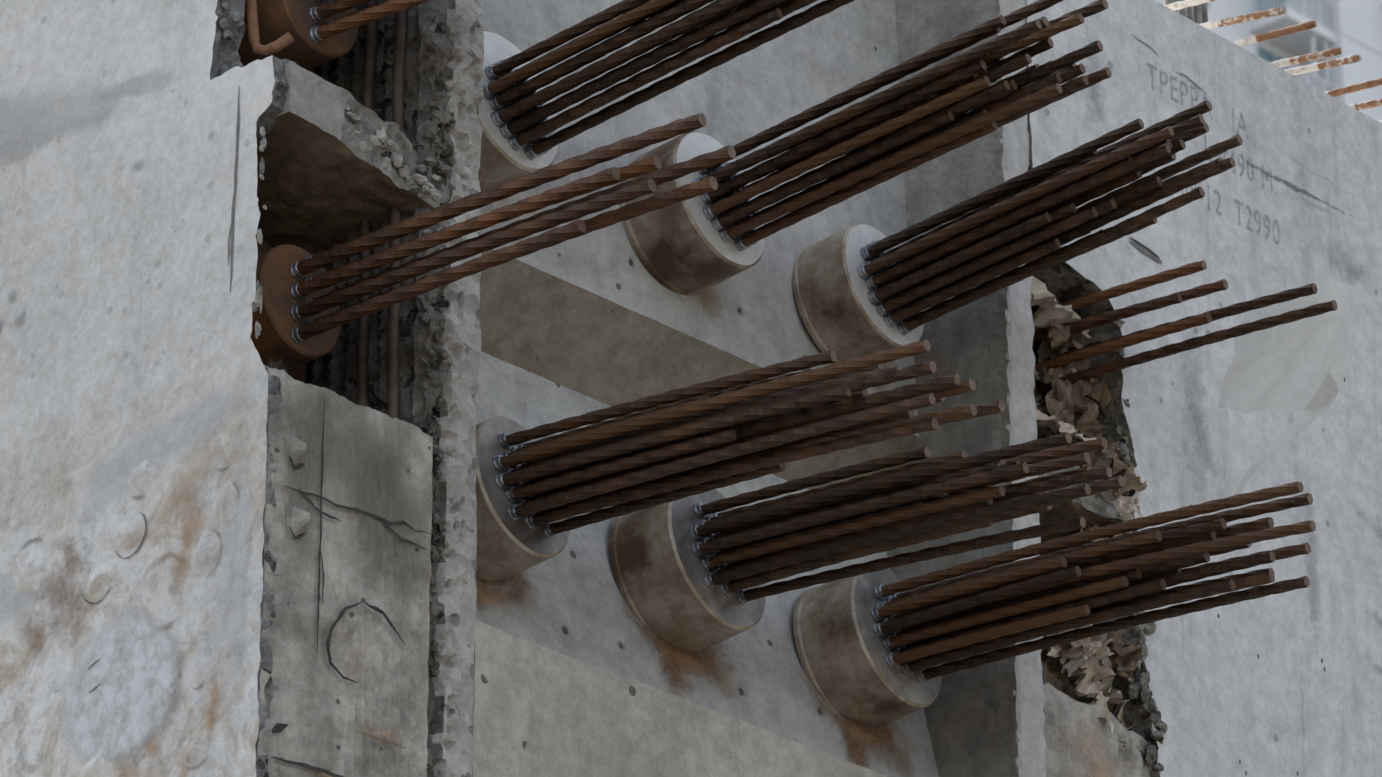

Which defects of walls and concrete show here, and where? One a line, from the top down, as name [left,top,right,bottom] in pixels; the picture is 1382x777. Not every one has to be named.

crack [228,90,239,290]
spalling [219,0,295,74]
spalling [259,120,267,180]
spalling [347,0,456,205]
spalling [252,280,262,339]
spalling [418,268,448,597]
crack [283,403,432,683]
spalling [428,639,440,677]
spalling [1122,611,1168,777]